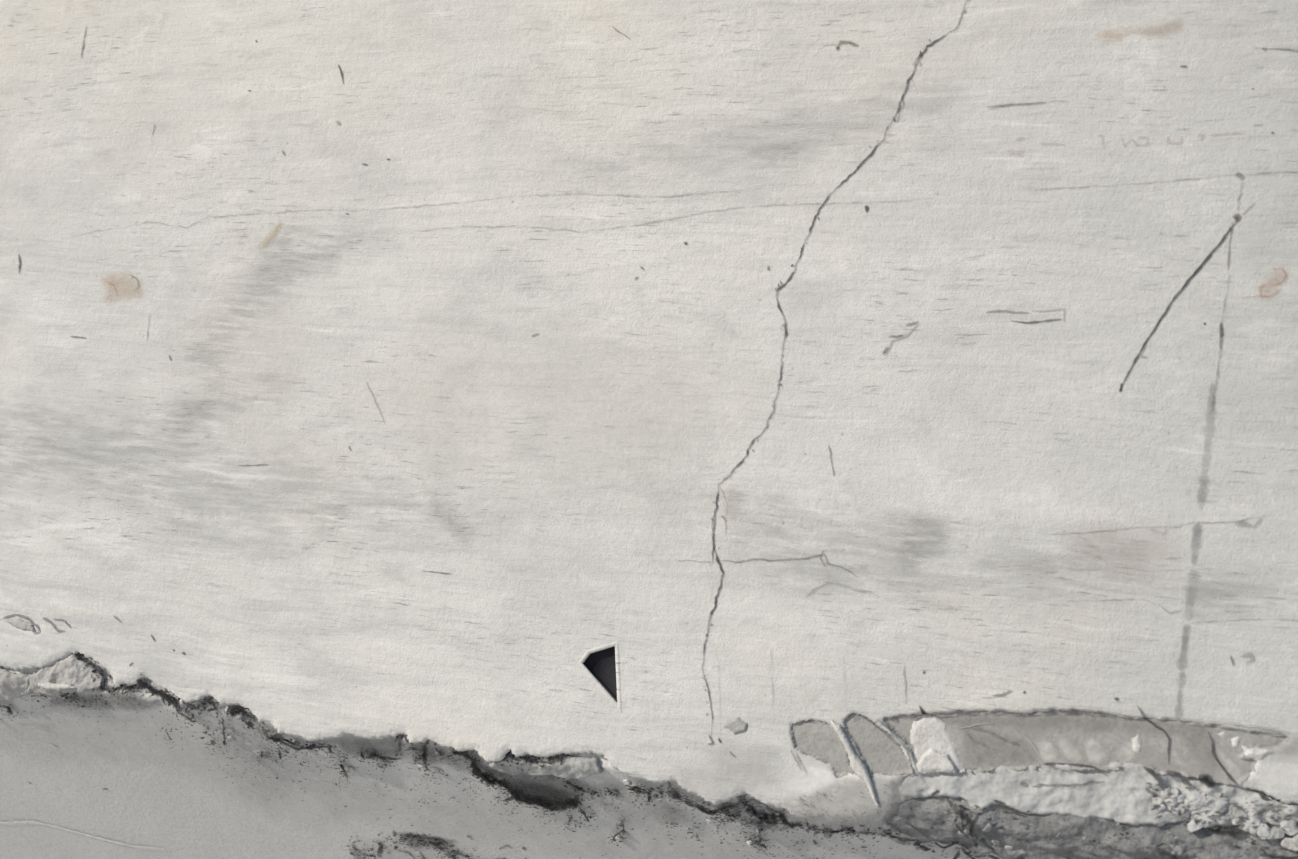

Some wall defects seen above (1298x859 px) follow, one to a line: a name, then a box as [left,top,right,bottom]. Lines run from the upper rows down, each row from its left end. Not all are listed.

crack [677,10,966,719]
crack [1119,193,1255,392]